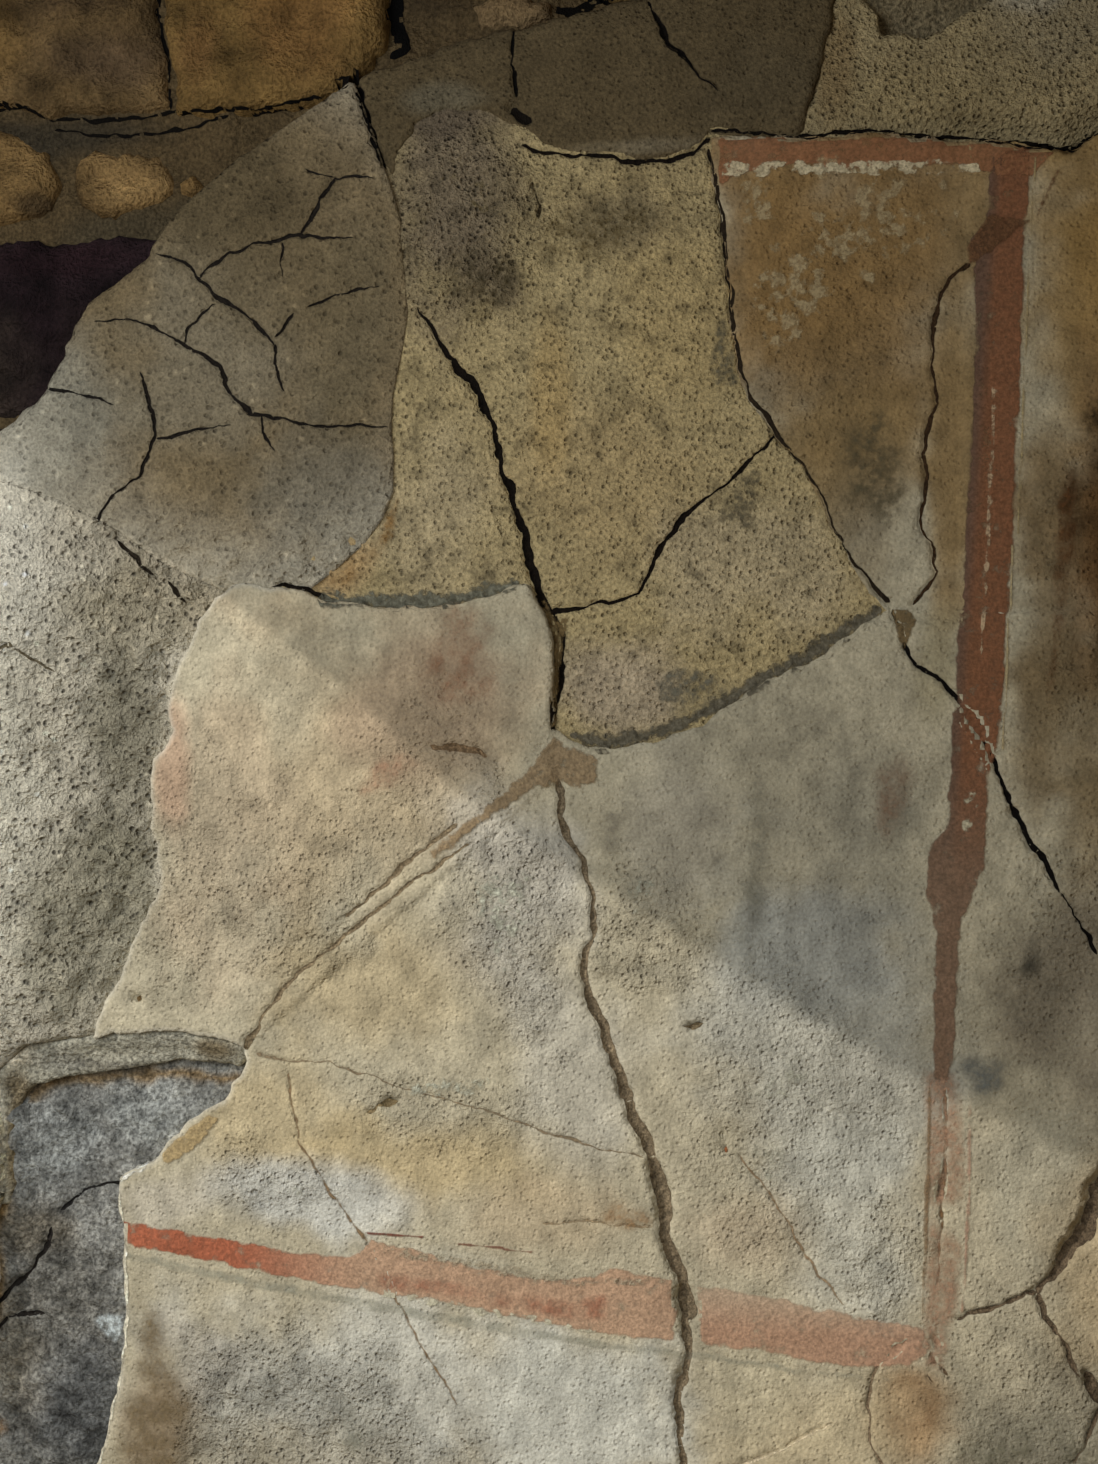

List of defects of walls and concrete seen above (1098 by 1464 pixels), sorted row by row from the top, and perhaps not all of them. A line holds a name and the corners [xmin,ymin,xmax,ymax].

crack [510,31,518,97]
crack [555,0,613,18]
crack [648,1,718,91]
crack [0,0,388,603]
spalling [0,0,1098,754]
crack [417,128,1098,955]
spalling [0,1031,247,1464]
crack [244,779,697,1464]
crack [739,1155,842,1304]
crack [866,1344,903,1464]
crack [957,1177,1098,1464]